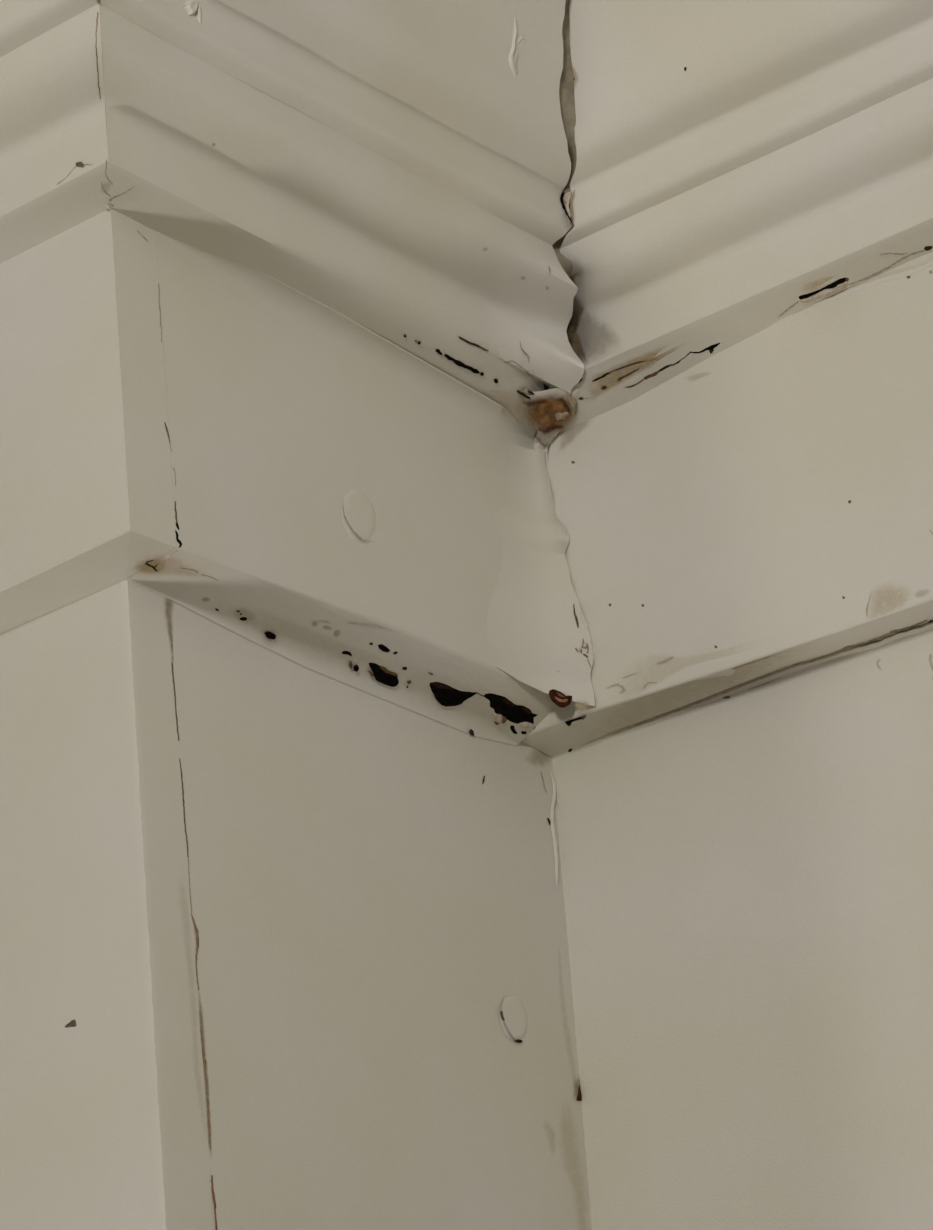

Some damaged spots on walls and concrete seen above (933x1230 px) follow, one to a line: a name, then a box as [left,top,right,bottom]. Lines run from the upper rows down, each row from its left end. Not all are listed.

crack [552,0,577,278]
crack [156,283,164,342]
spalling [799,277,849,300]
corrosion [517,354,660,451]
crack [143,422,218,581]
spalling [342,644,399,687]
spalling [429,682,537,724]
crack [166,600,217,1230]